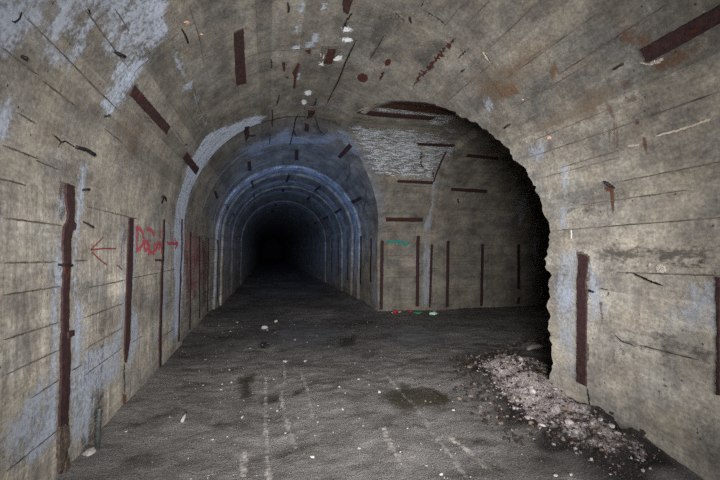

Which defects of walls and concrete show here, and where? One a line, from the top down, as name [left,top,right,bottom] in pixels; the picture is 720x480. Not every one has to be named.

damp [0,0,167,118]
damp [0,97,12,141]
damp [338,108,456,185]
crack [626,273,663,286]